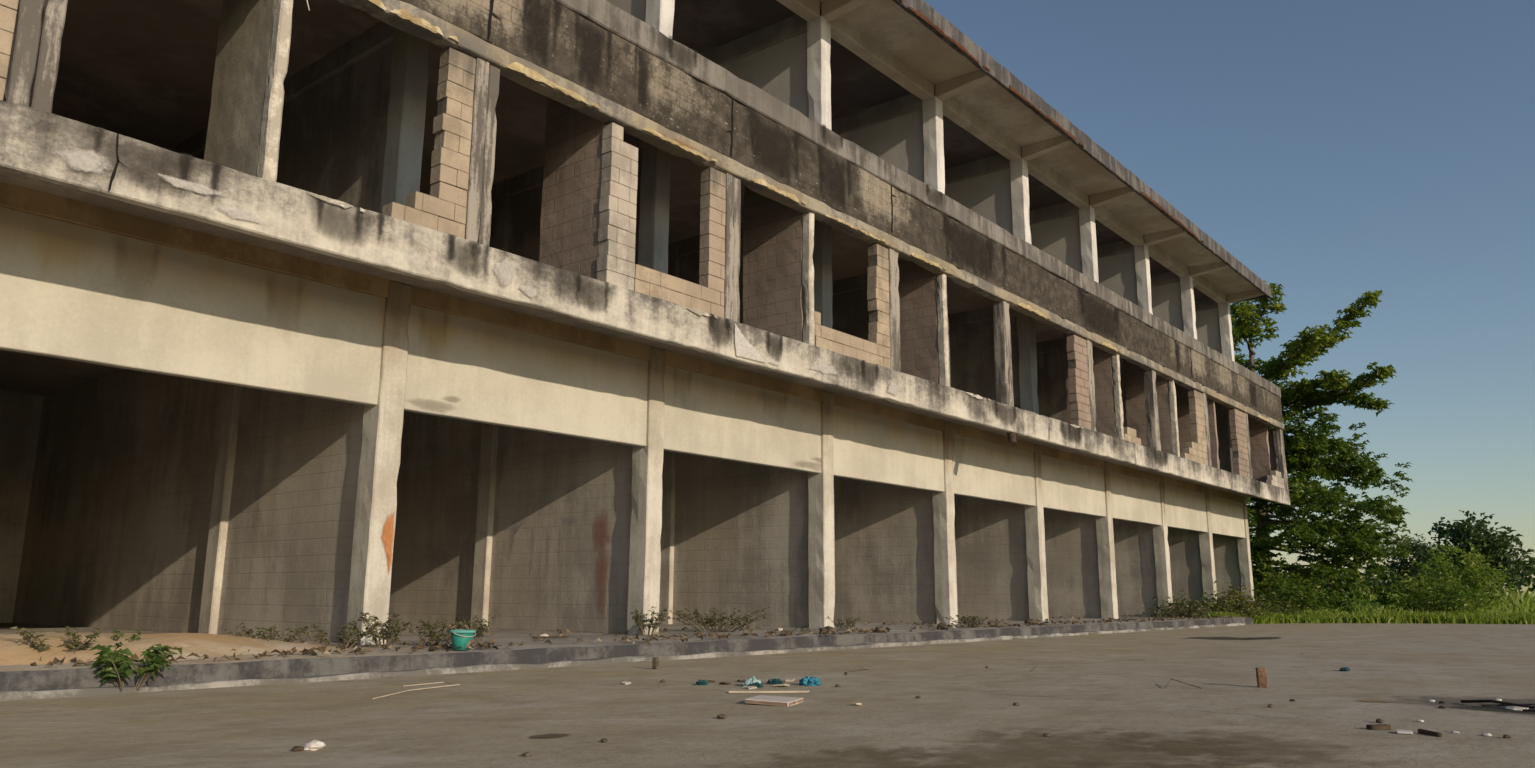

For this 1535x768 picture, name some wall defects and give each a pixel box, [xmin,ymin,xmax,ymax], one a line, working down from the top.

spalling [368,0,459,43]
leakage [523,0,612,83]
spalling [257,0,293,182]
leakage [636,45,647,104]
crack [109,133,131,190]
leakage [98,127,192,182]
leakage [819,124,851,206]
leakage [318,194,384,236]
leakage [449,234,489,271]
leakage [927,184,1006,275]
leakage [577,273,611,306]
corrosion [382,515,394,571]